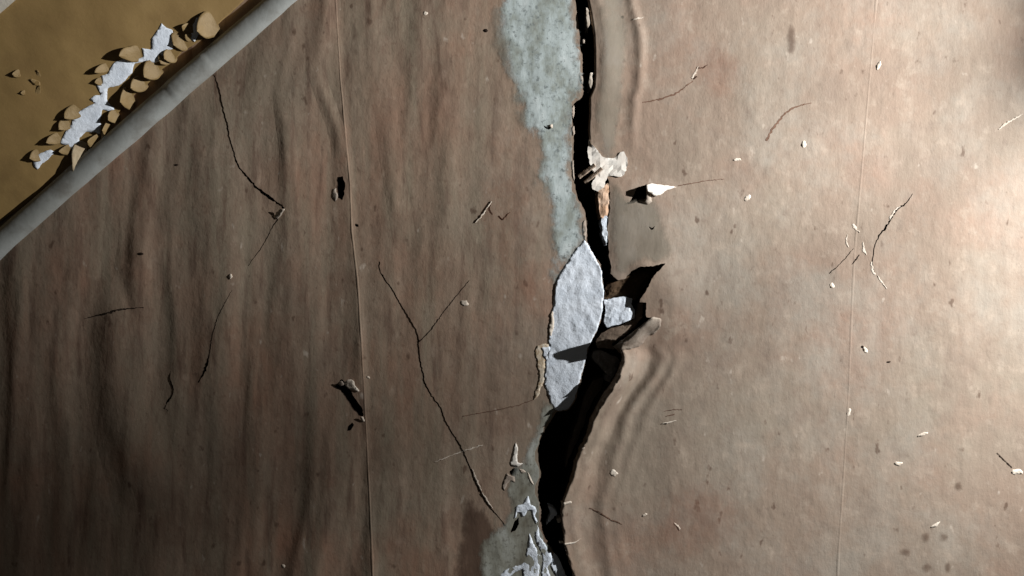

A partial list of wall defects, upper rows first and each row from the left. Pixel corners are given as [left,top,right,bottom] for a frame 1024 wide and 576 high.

peeling [29,11,220,170]
crack [198,75,285,383]
crack [378,262,506,526]
leakage [496,0,582,260]
flaking render [533,240,604,411]
crack [538,0,665,576]
crack [829,195,912,289]
flaking render [499,496,566,576]